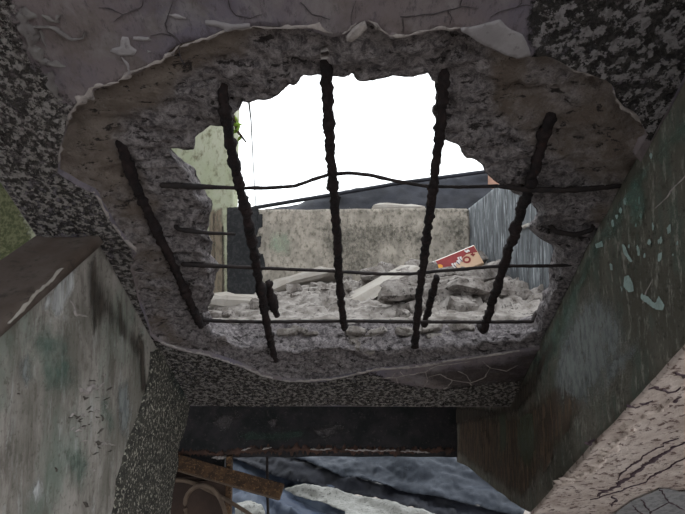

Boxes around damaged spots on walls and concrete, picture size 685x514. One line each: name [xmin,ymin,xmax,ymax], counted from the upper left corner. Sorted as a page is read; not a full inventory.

crack [151,5,185,65]
crack [400,0,533,33]
spalling [57,19,645,382]
peeling [622,222,671,262]
peeling [620,275,664,310]
crack [590,438,685,500]